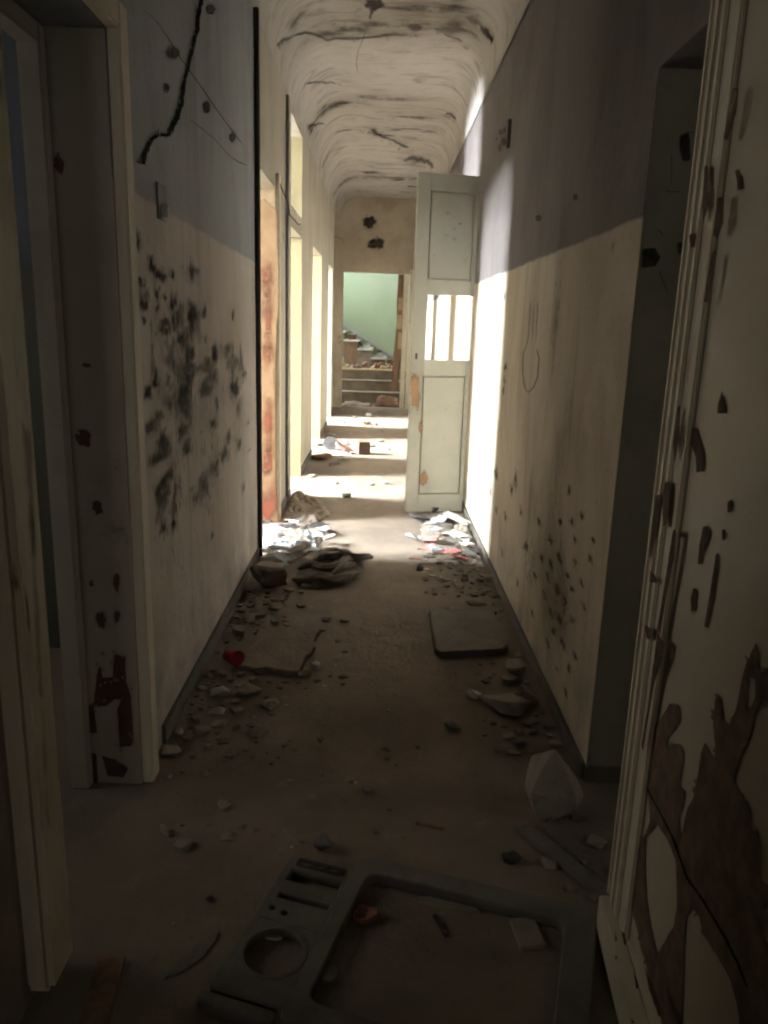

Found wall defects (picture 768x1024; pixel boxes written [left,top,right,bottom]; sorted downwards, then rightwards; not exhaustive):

crack [136,0,246,165]
flaking render [681,133,690,161]
peeling [724,88,739,140]
flaking render [363,216,384,249]
flaking render [642,248,660,267]
peeling [702,165,724,302]
water stain [138,258,250,533]
peeling [411,375,423,433]
peeling [717,392,726,414]
peeling [673,406,705,472]
peeling [88,651,134,783]
peeling [615,482,768,1024]